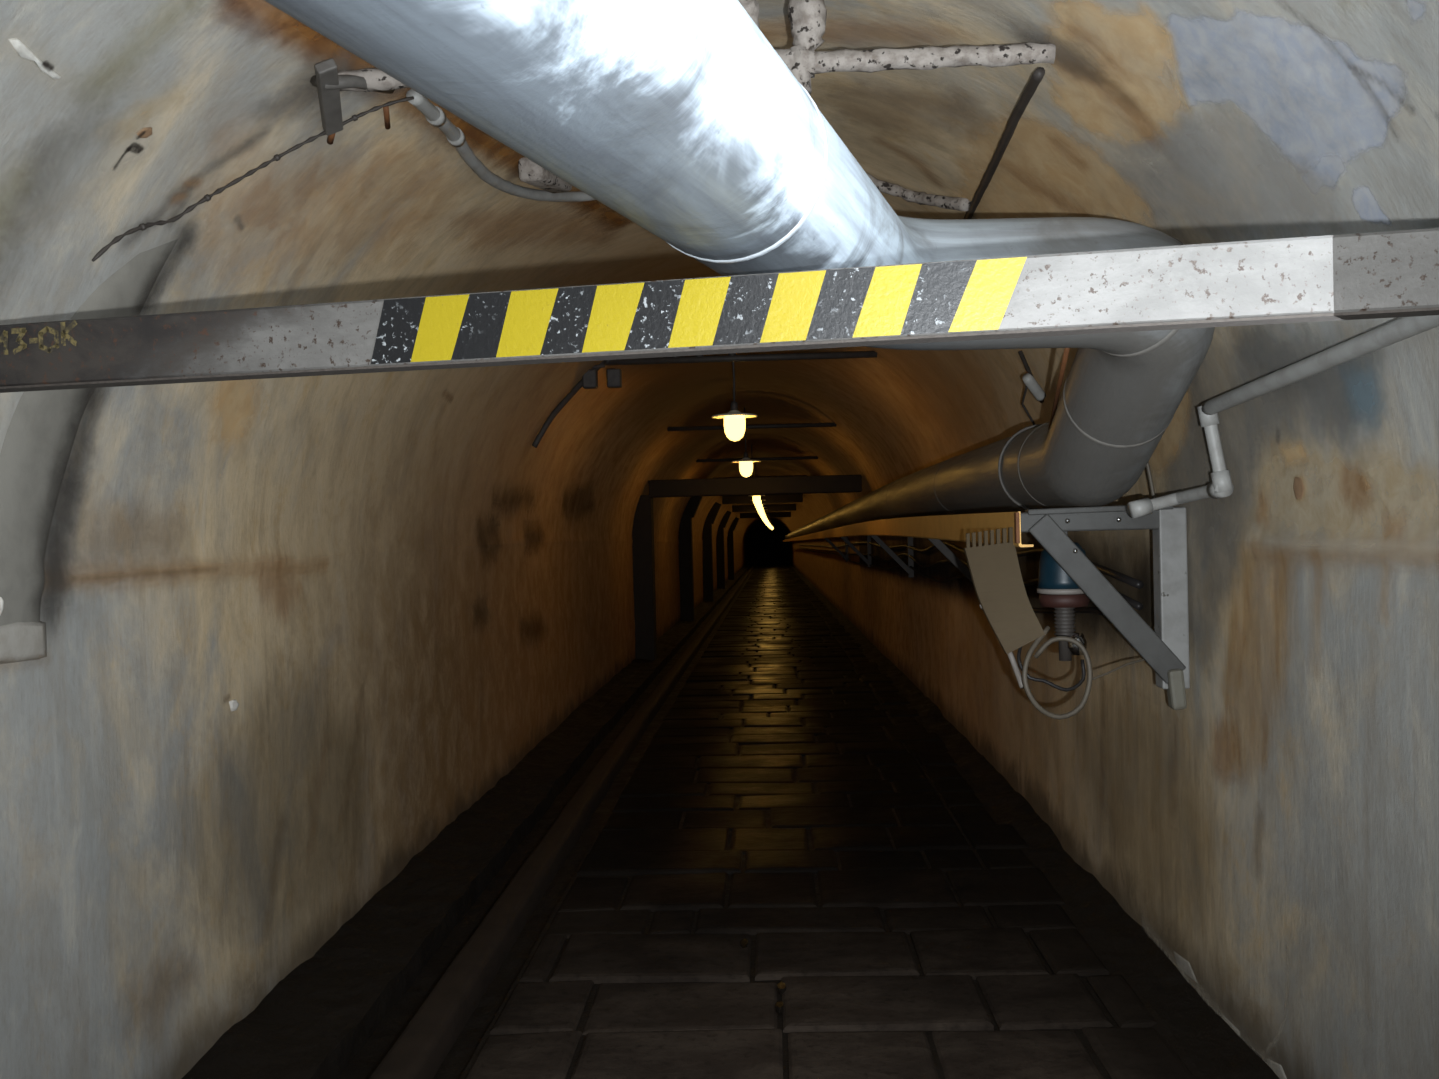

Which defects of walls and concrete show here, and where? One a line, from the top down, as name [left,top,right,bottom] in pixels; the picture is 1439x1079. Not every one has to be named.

leakage [963,118,1145,222]
leakage [1052,3,1171,139]
peeling [1164,12,1404,194]
peeling [1353,186,1390,224]